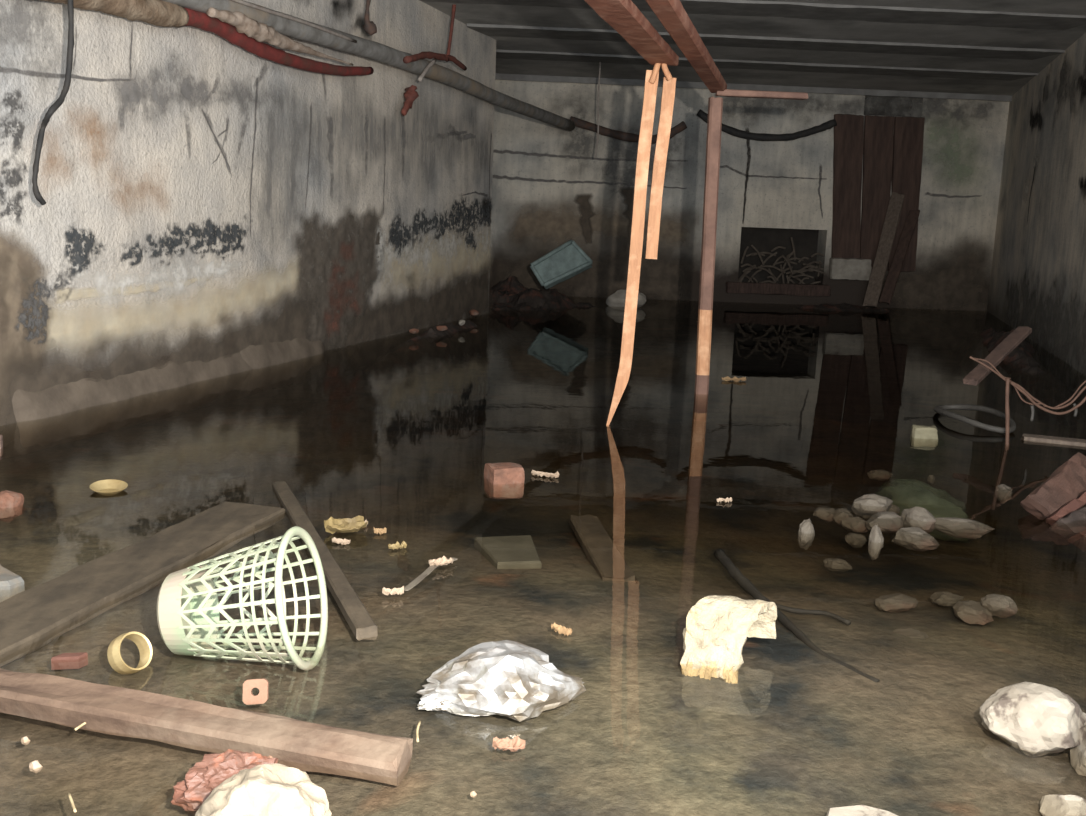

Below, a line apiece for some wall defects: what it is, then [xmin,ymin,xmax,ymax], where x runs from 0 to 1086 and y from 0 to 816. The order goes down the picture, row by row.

leakage [0,235,312,460]
leakage [312,105,488,183]
leakage [323,128,692,359]
leakage [723,96,992,120]